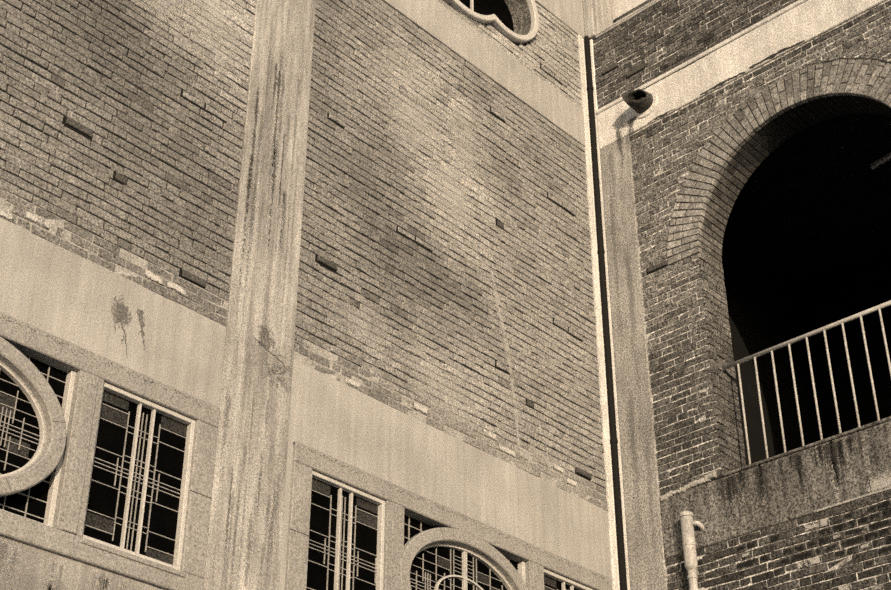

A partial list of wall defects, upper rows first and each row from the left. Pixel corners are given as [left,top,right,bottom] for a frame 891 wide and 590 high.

damp [243,90,259,249]
damp [268,63,285,248]
damp [719,465,770,522]
damp [779,453,804,496]
damp [737,487,891,573]
damp [814,434,864,481]